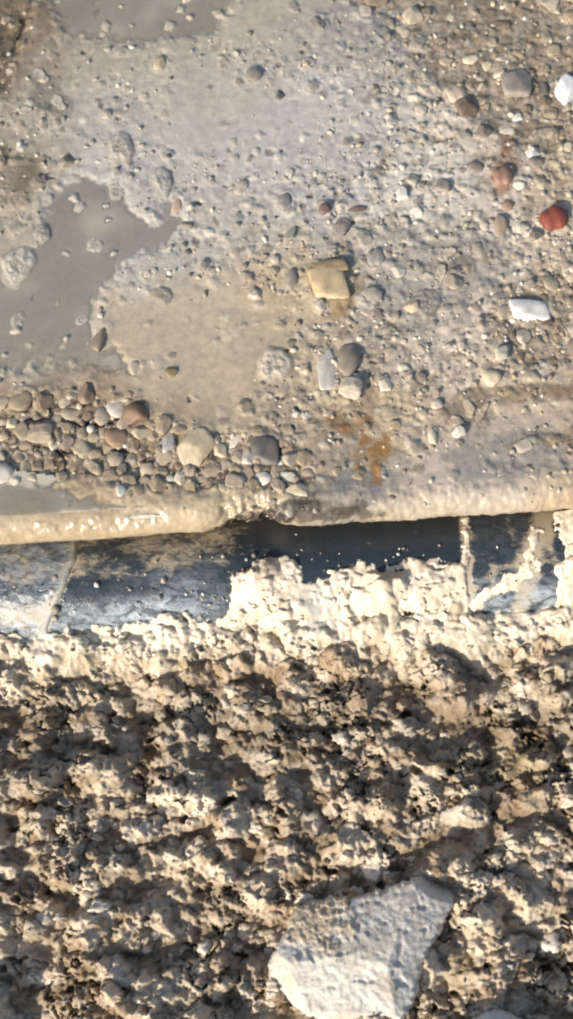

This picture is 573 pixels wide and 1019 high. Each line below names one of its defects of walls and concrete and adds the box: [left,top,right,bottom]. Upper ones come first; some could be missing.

corrosion [326,415,391,485]
spalling [214,510,294,529]